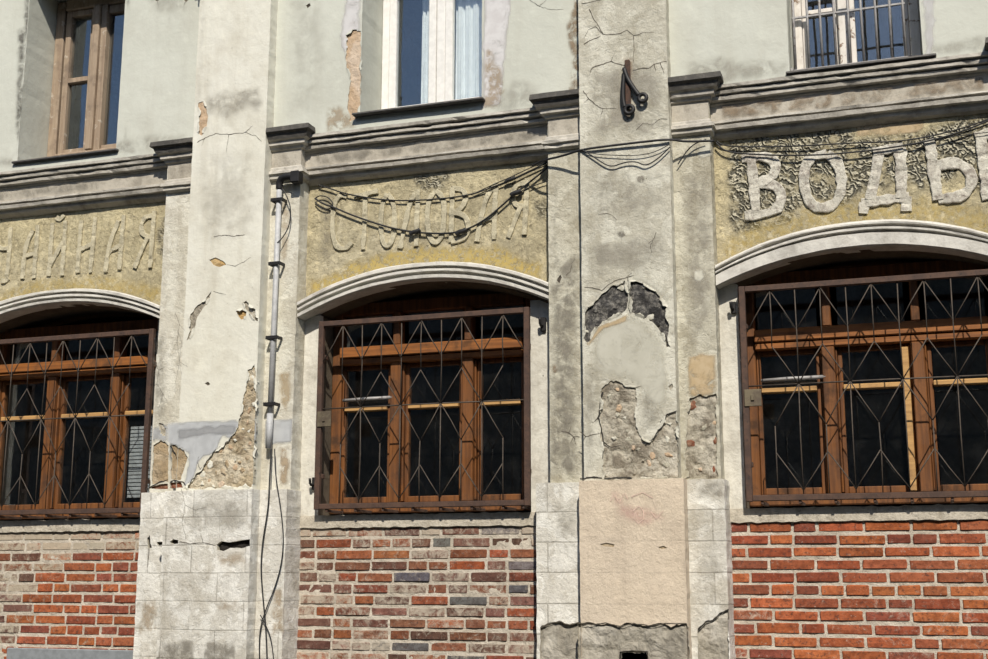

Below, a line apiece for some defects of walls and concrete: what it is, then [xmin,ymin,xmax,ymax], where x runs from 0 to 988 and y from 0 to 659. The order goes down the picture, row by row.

peeling [197,101,208,135]
flaking render [345,29,362,122]
crack [582,0,667,114]
flaking render [187,292,211,340]
flaking render [236,301,259,321]
flaking render [583,279,671,347]
spalling [149,364,259,490]
spalling [599,381,719,480]
crack [146,441,228,546]